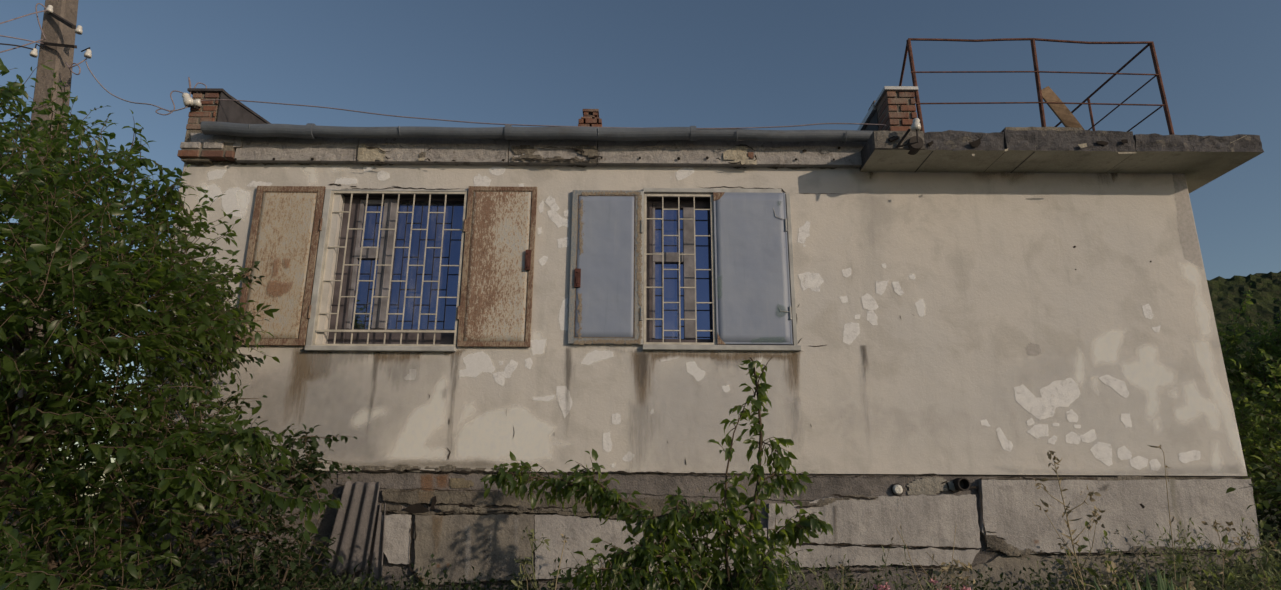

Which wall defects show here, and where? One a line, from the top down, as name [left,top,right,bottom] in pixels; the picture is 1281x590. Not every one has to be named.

spalling [474,145,603,186]
corrosion [267,257,293,297]
peeling [798,272,824,292]
peeling [839,263,925,345]
peeling [459,339,546,396]
peeling [532,386,573,418]
peeling [980,419,1013,452]
peeling [1014,375,1161,481]